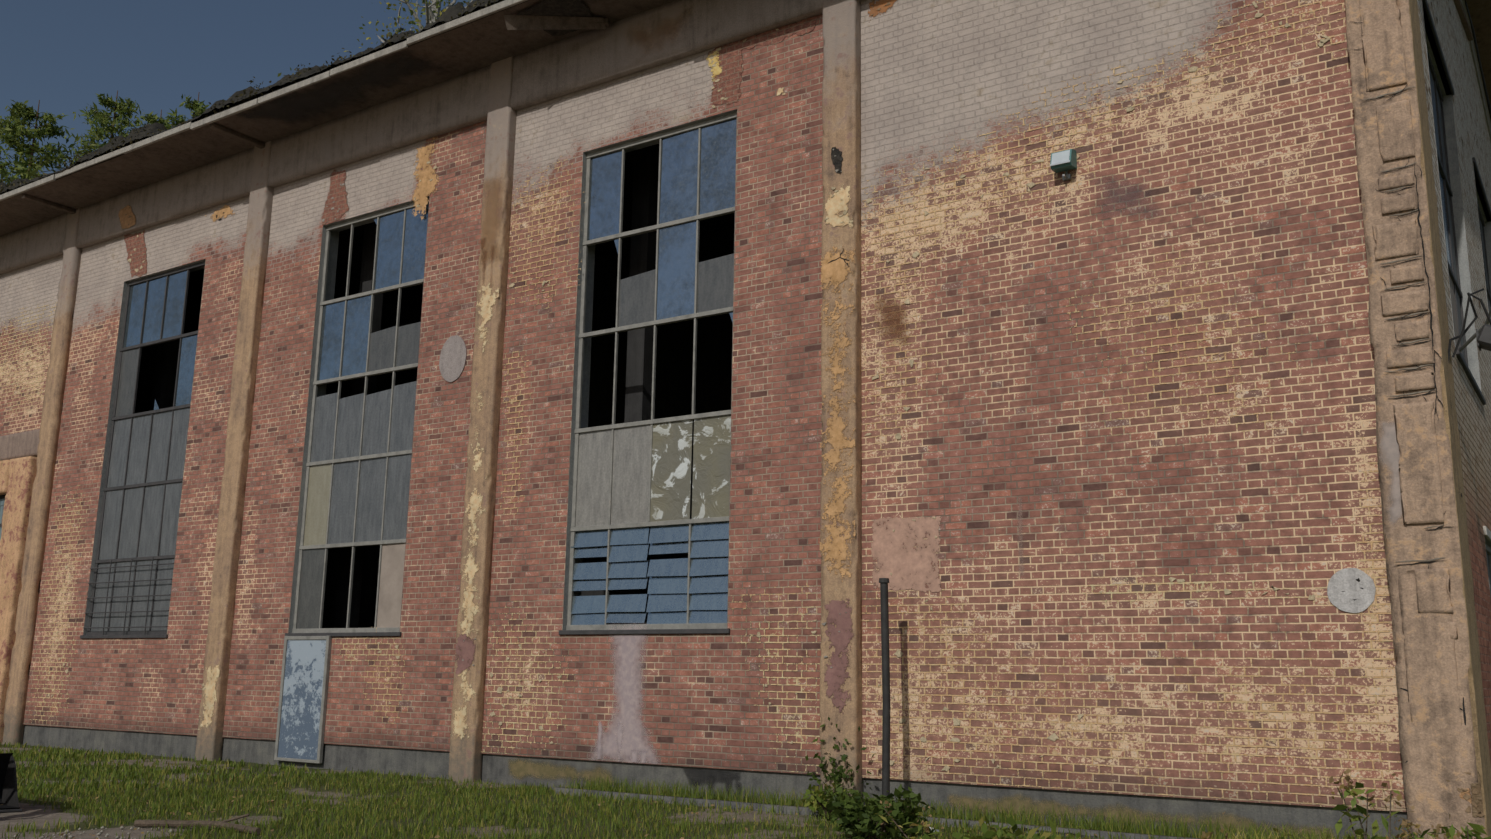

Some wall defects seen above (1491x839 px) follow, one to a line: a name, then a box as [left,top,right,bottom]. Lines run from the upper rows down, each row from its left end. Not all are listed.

peeling [452,350,576,754]
peeling [476,156,584,352]
leakage [509,628,655,783]
peeling [731,0,1404,808]